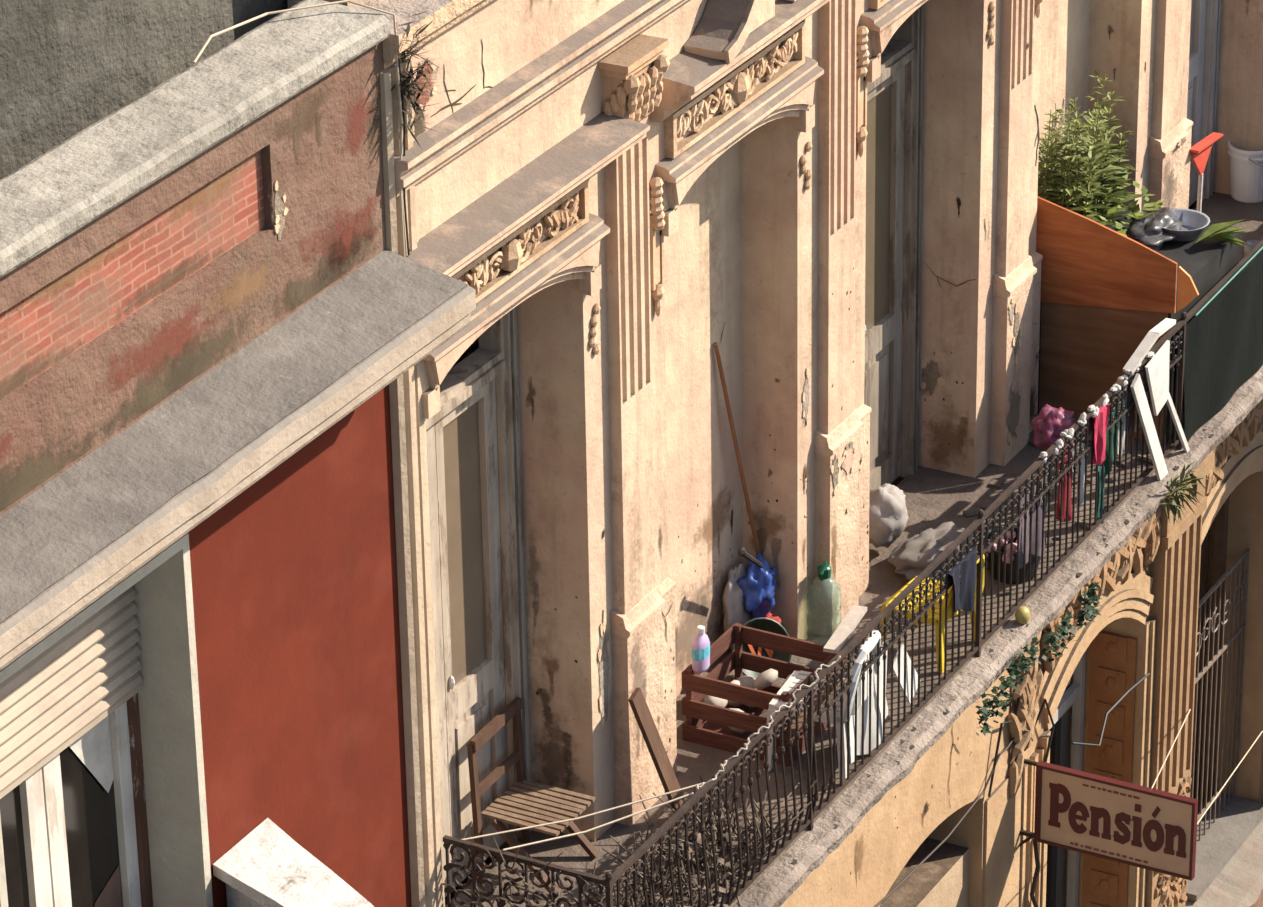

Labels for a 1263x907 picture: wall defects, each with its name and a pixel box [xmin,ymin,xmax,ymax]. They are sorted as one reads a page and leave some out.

crack [431,39,493,117]
leakage [349,89,382,151]
leakage [285,204,374,310]
crack [925,264,976,287]
leakage [931,417,967,463]
leakage [704,493,730,553]
leakage [536,660,573,791]